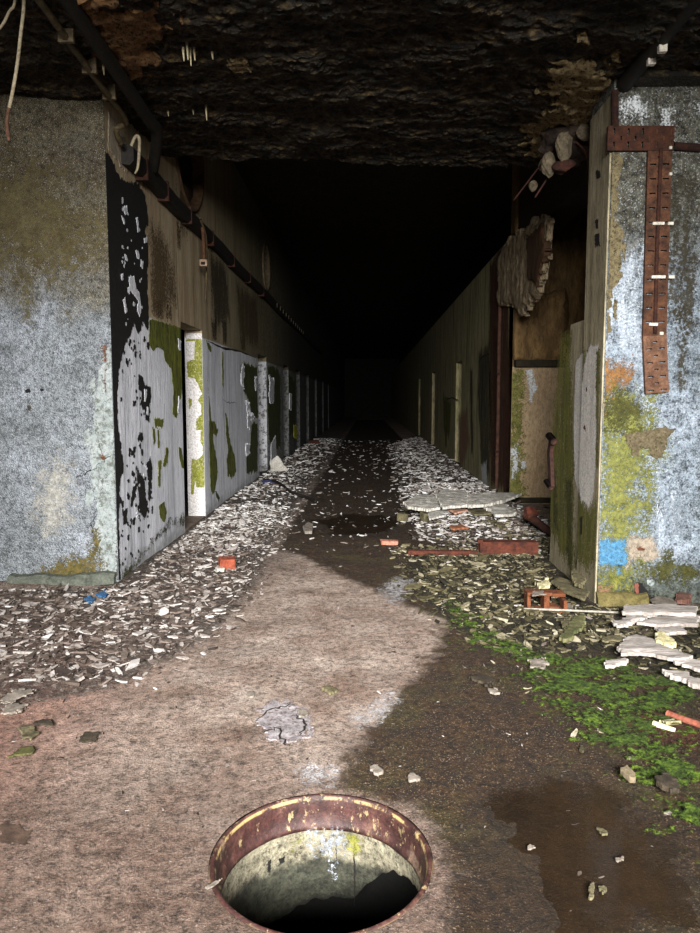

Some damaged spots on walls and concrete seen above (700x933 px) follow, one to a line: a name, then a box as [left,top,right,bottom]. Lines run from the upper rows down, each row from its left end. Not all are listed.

spalling [577,30,590,46]
spalling [513,49,621,201]
spalling [27,112,295,582]
spalling [623,425,676,459]
spalling [634,579,654,604]